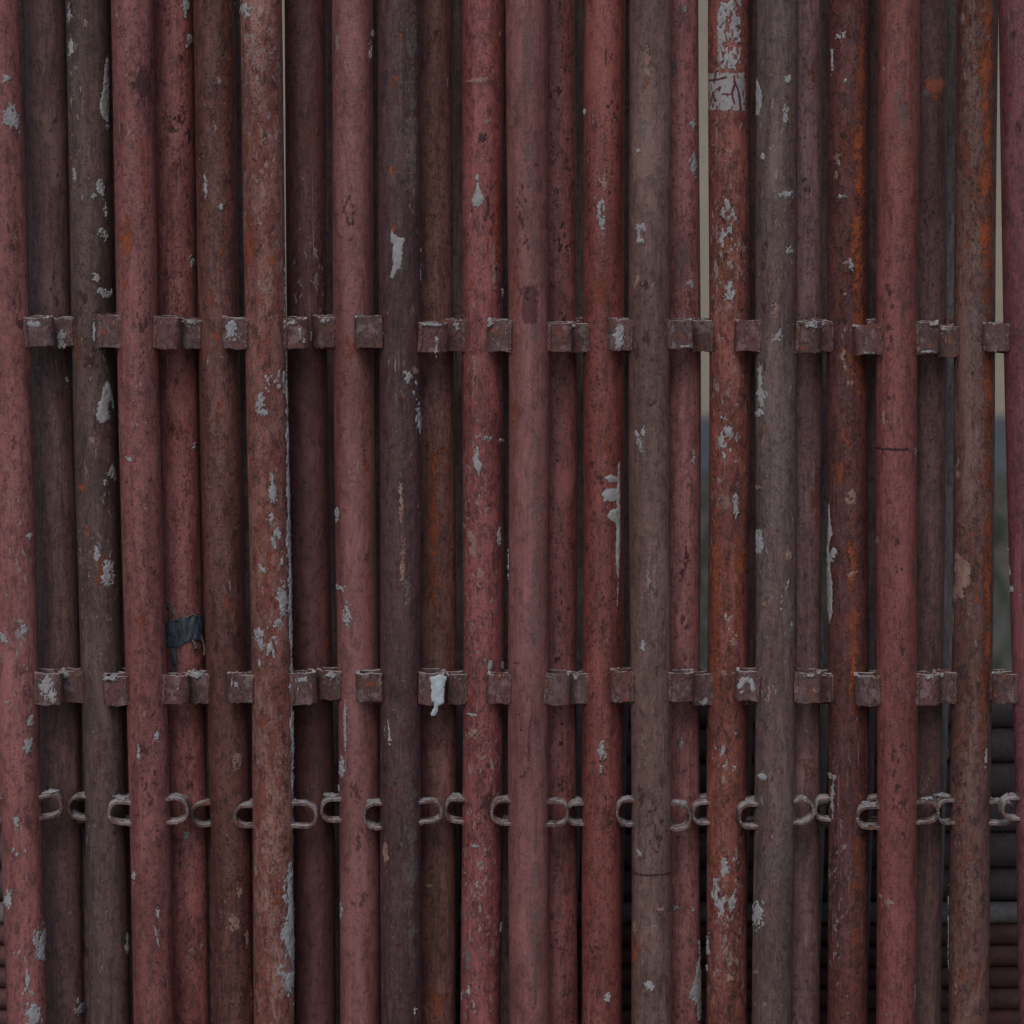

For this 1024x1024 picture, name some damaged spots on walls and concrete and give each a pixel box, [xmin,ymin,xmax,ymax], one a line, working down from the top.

rust [849,3,867,325]
rust [957,0,995,322]
rust [711,477,744,698]
rust [845,511,860,716]
rust [965,351,994,759]